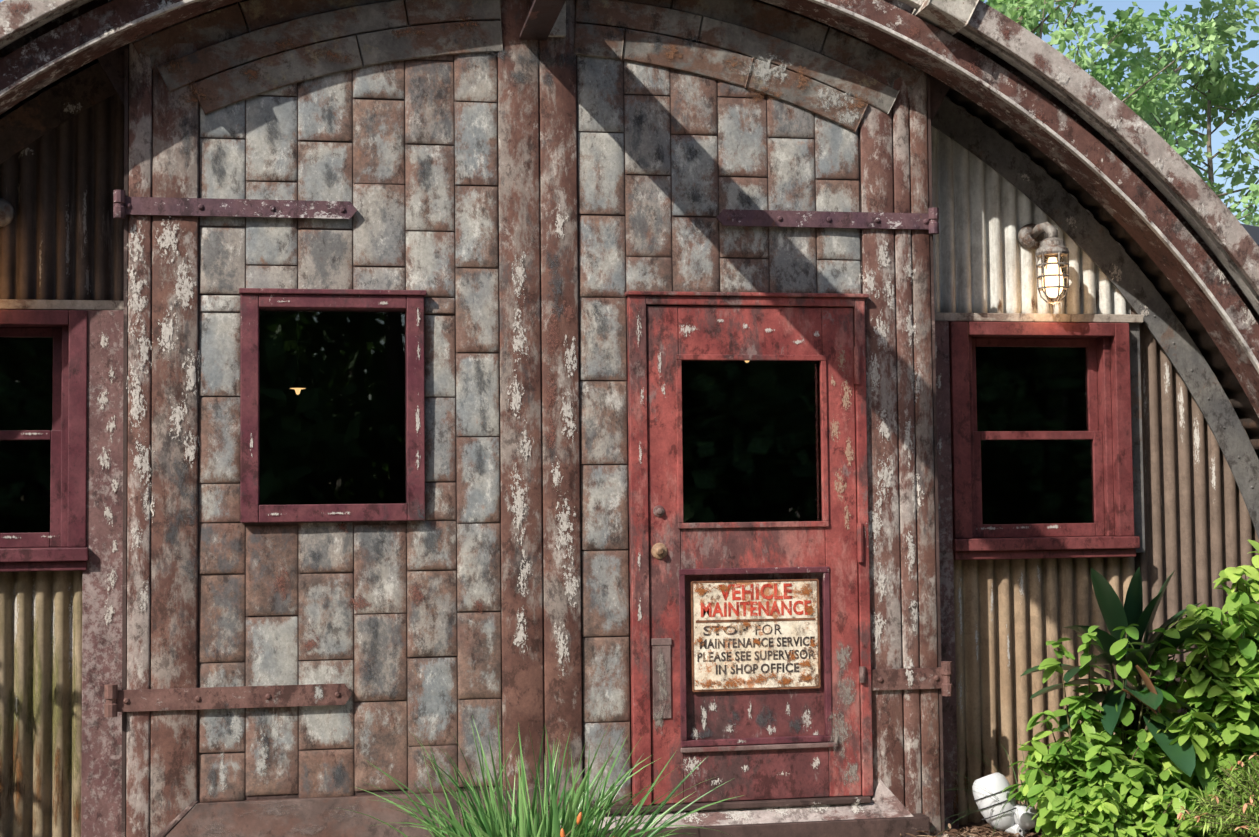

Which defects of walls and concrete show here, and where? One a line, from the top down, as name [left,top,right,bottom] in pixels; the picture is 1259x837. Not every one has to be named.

rust [6,1,32,14]
peeling [96,217,201,559]
peeling [507,251,534,653]
peeling [560,335,578,448]
peeling [829,350,854,529]
peeling [859,240,924,654]
peeling [551,456,580,611]
peeling [554,622,570,676]
peeling [691,699,716,740]
spalling [802,644,859,787]
peeling [904,657,914,687]
peeling [651,802,834,824]